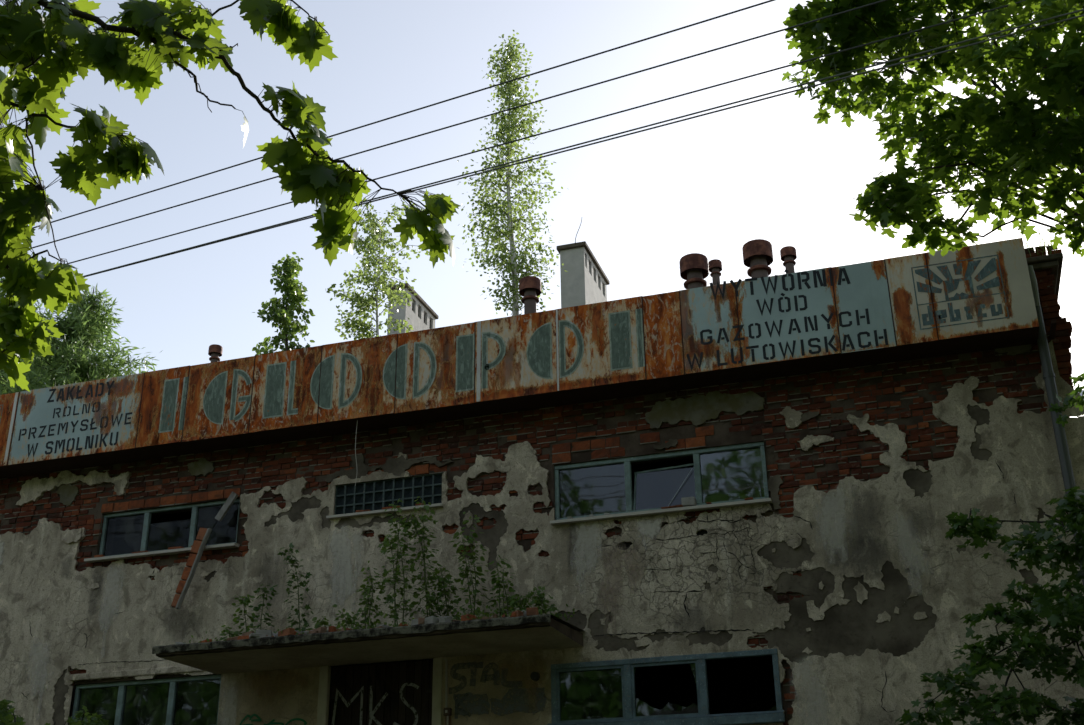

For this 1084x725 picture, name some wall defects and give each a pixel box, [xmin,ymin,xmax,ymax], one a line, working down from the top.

rust [56,349,338,449]
rust [351,327,648,419]
flaking render [0,270,1071,582]
rust [587,302,605,356]
rust [676,282,820,374]
rust [825,266,917,354]
rust [871,259,887,280]
flaking render [1024,245,1062,258]
crack [656,513,756,578]
peeling [557,610,733,652]
crack [595,568,751,636]
peeling [748,533,937,725]